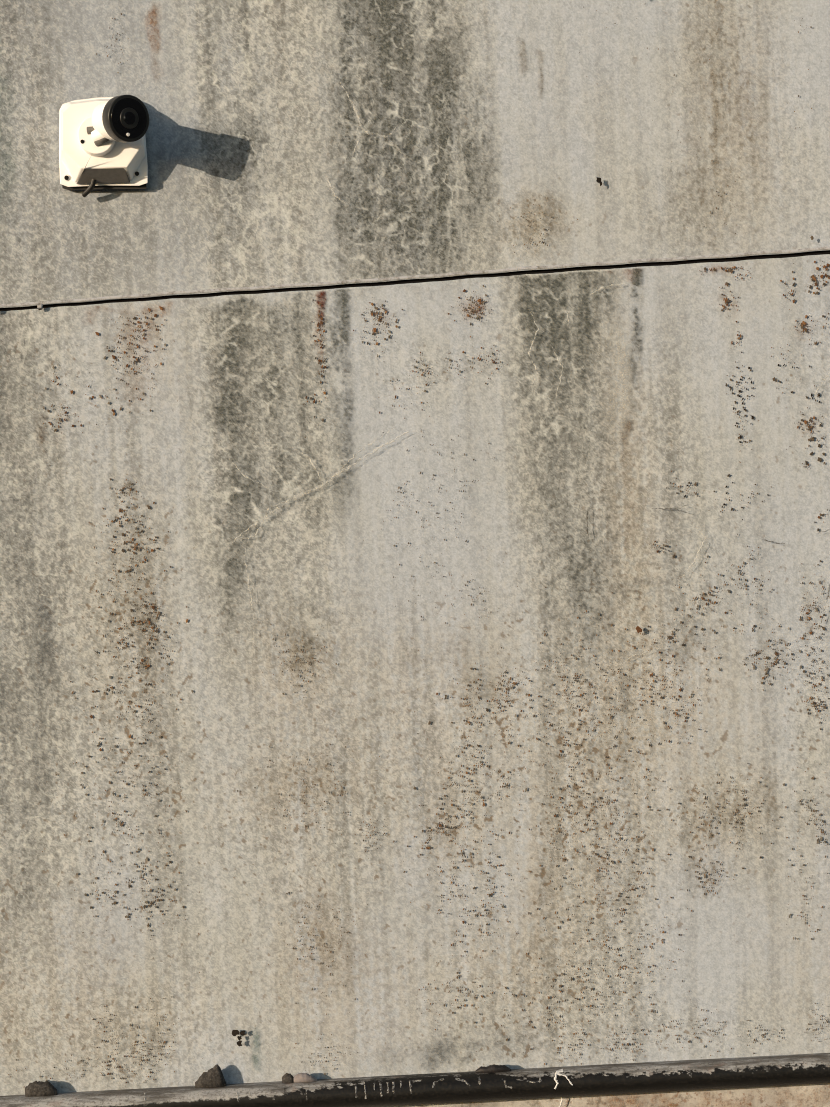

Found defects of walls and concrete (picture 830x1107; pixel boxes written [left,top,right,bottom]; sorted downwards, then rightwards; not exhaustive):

corrosion [44,306,175,416]
corrosion [303,291,327,425]
leakage [632,269,641,344]
corrosion [771,261,830,393]
corrosion [794,385,827,468]
corrosion [383,429,490,577]
corrosion [70,478,200,940]
corrosion [262,627,327,698]
corrosion [274,744,358,844]
corrosion [403,546,830,1065]
corrosion [287,895,366,1015]